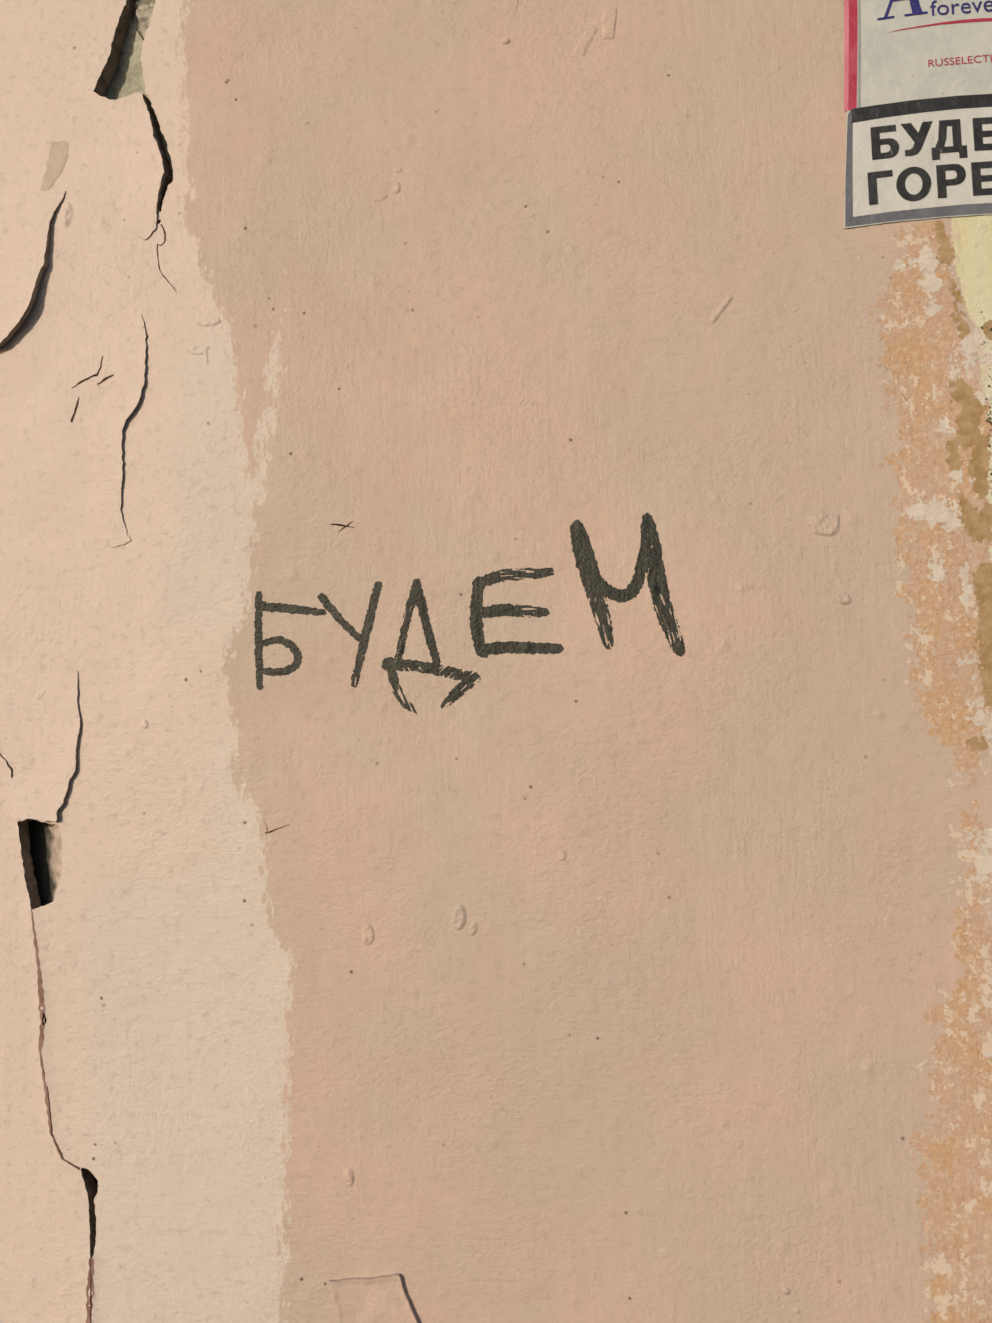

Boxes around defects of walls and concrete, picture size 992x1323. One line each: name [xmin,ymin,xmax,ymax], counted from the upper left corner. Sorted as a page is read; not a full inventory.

peeling [105,0,173,240]
peeling [0,140,68,347]
peeling [86,313,147,547]
peeling [10,665,82,906]
peeling [866,220,992,1323]
crack [31,911,98,1186]
crack [86,1258,94,1323]